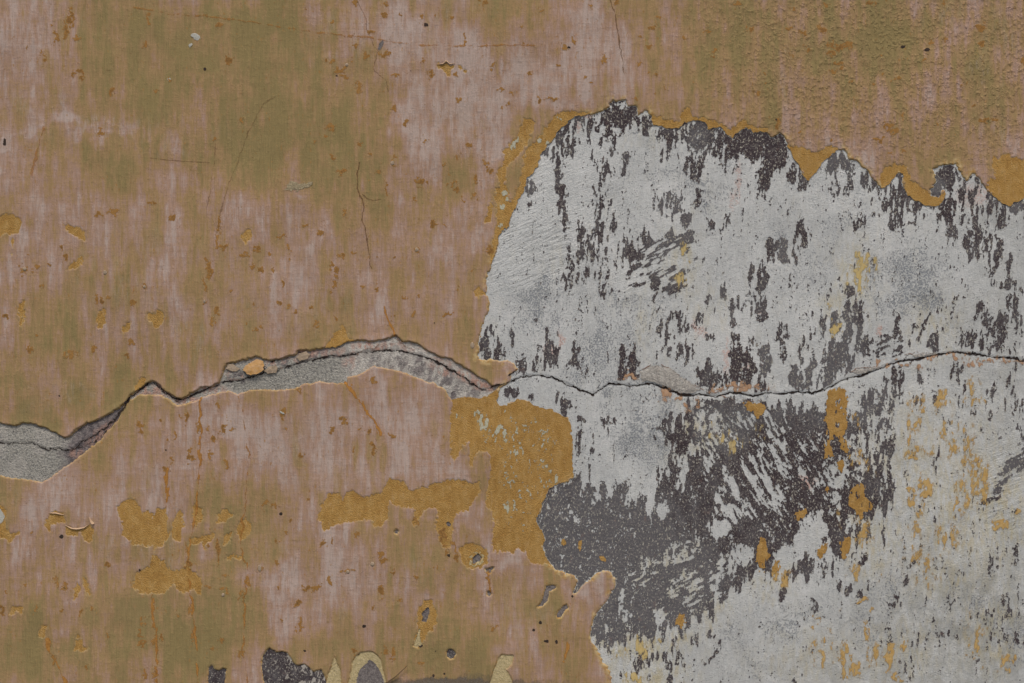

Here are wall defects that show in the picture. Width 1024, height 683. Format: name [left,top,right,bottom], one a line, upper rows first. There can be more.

crack [0,336,1024,451]
peeling [117,100,1024,683]
peeling [44,511,94,542]